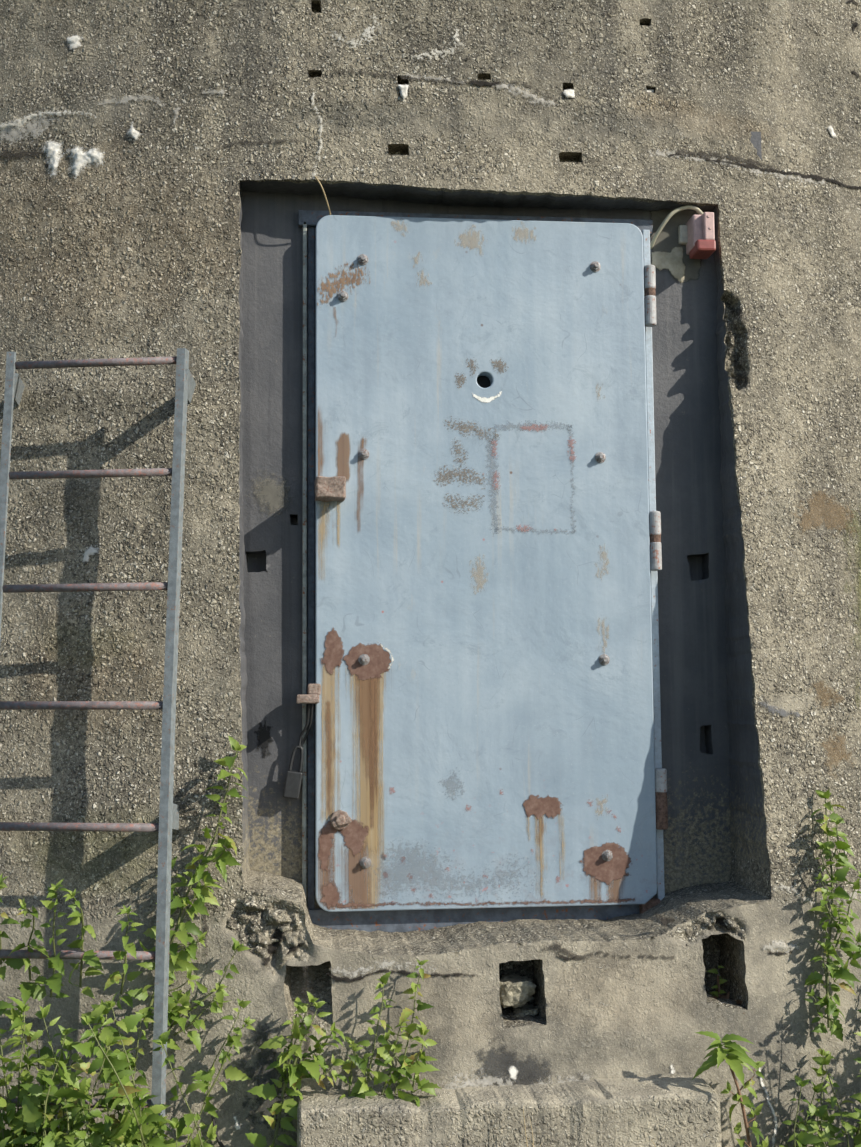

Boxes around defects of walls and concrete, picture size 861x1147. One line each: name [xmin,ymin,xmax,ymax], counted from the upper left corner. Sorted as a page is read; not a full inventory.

damp [43,140,104,178]
crack [649,149,861,189]
rust [317,262,370,318]
spalling [723,293,751,392]
rust [337,433,364,526]
rust [318,628,635,910]
spalling [226,899,313,976]
crack [301,961,475,1061]